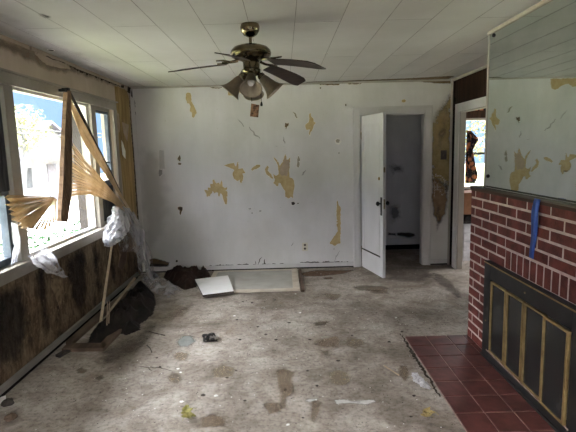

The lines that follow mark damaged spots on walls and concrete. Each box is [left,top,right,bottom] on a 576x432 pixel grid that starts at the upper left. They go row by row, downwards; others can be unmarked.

peeling [185,92,197,118]
peeling [204,179,228,205]
peeling [223,154,301,206]
peeling [330,200,341,250]